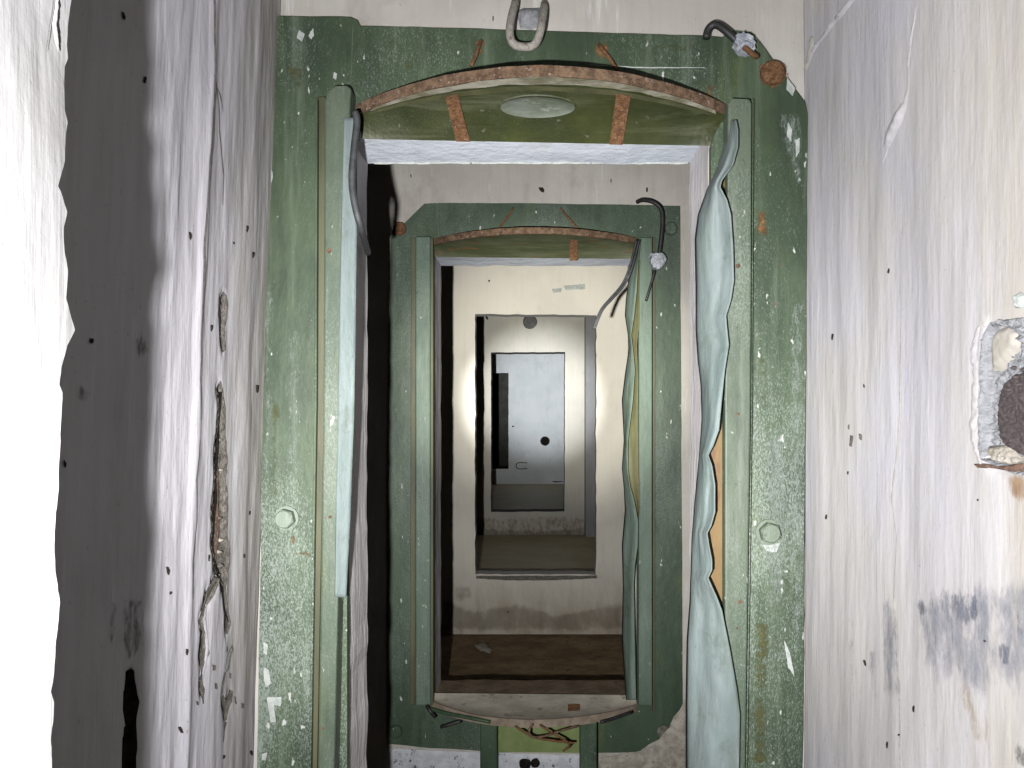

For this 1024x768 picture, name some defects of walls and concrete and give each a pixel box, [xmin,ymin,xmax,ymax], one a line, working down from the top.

spalling [218,292,228,353]
spalling [969,292,1024,475]
damp [921,596,988,682]
damp [999,628,1024,673]